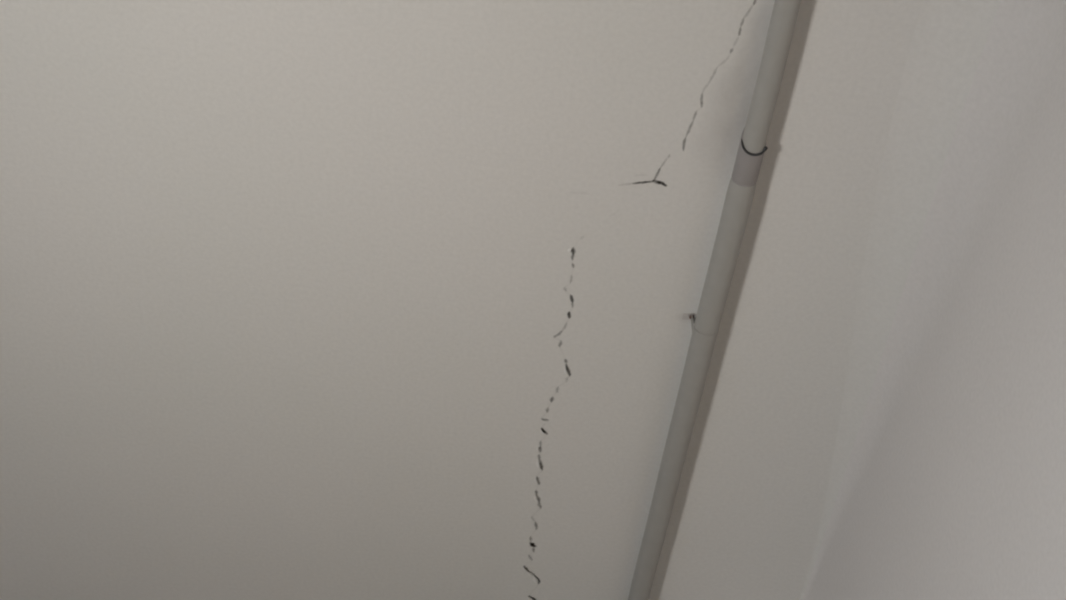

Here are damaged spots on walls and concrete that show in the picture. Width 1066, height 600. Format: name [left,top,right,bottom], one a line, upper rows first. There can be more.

crack [534,428,546,502]
crack [522,543,540,600]